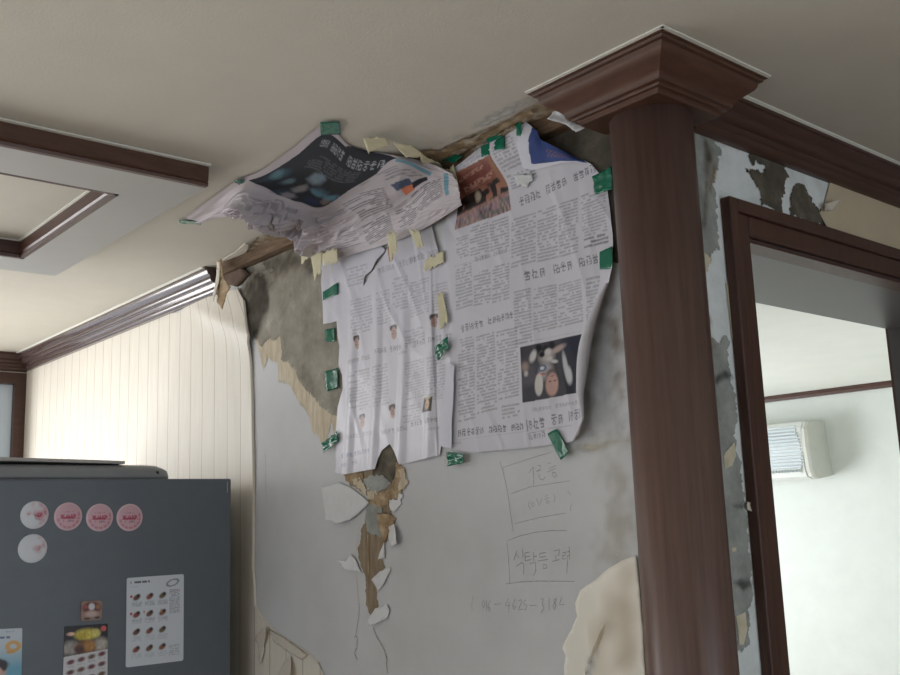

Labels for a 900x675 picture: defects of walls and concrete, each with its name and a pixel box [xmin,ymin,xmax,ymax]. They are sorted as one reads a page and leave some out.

spalling [694,133,722,273]
spalling [746,153,823,225]
spalling [242,248,343,443]
spalling [372,444,397,483]
spalling [711,335,753,652]